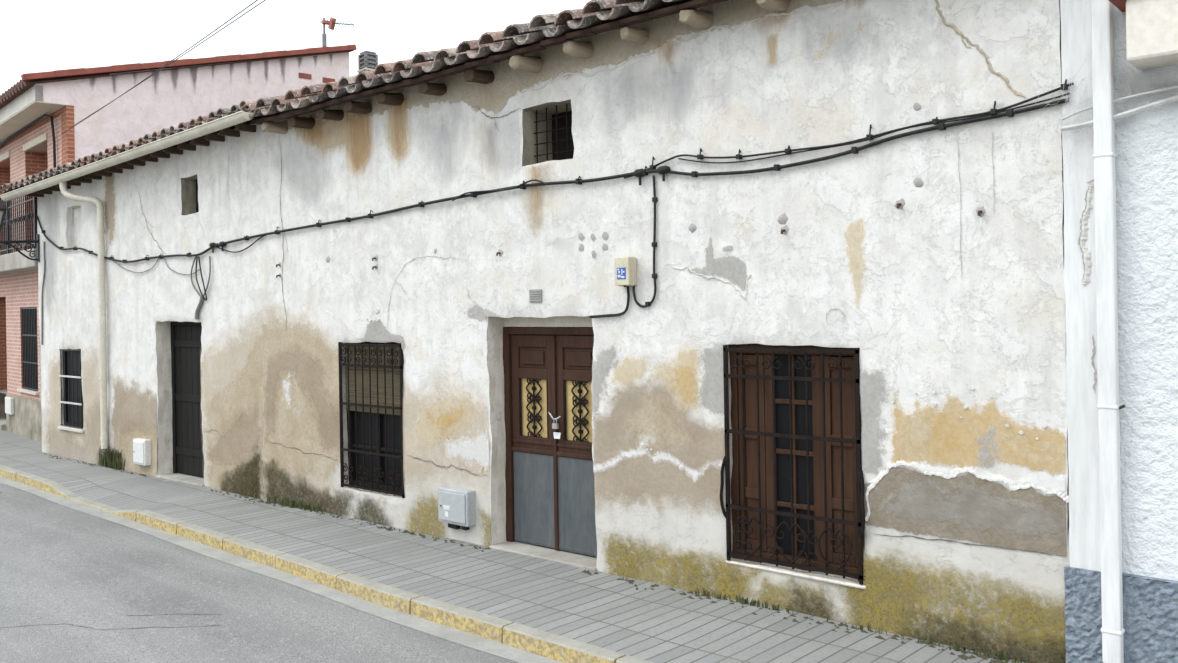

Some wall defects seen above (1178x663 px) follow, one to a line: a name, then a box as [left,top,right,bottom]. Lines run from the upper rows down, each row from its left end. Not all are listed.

crack [935,0,1026,98]
flaking render [673,237,752,300]
flaking render [359,309,404,348]
peeling [592,342,732,415]
damp [200,316,388,526]
damp [403,395,489,476]
flaking render [860,371,1069,557]